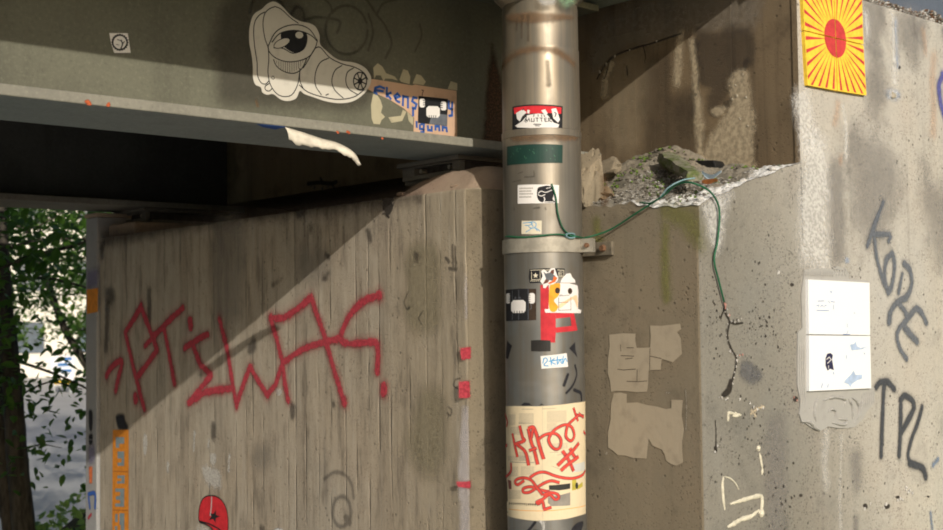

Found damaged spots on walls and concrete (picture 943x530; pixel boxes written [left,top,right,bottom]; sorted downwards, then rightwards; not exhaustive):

spalling [581,148,622,207]
peeling [646,71,791,206]
crack [714,303,743,453]